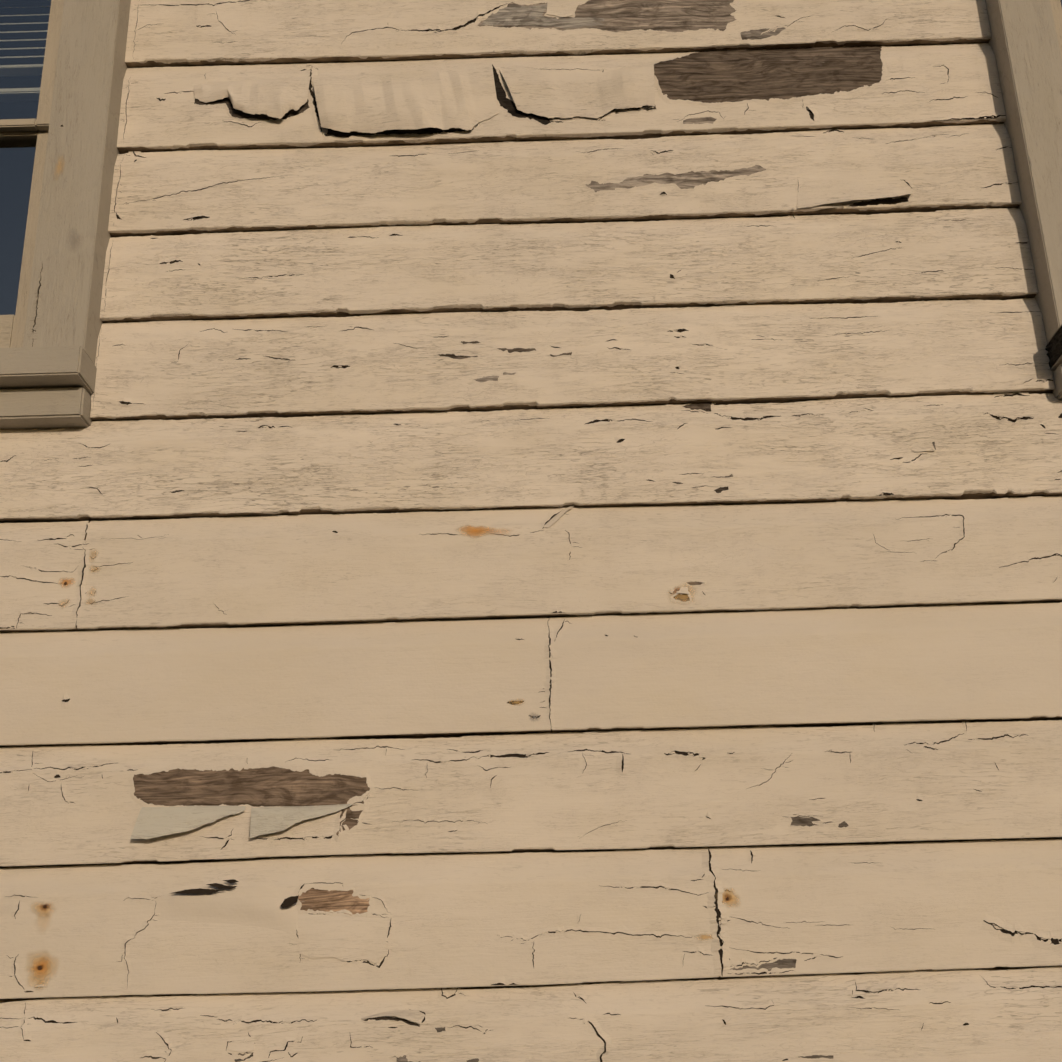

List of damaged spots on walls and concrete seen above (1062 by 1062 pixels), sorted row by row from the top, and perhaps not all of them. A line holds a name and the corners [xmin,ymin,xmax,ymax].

peeling [154,0,888,139]
peeling [583,162,769,195]
peeling [788,168,915,219]
crack [982,225,1060,437]
crack [0,522,170,629]
rust [419,527,545,540]
crack [333,617,632,840]
peeling [0,750,375,853]
rust [34,960,49,976]
peeling [296,879,393,918]
crack [436,848,853,1005]
crack [981,914,1062,953]